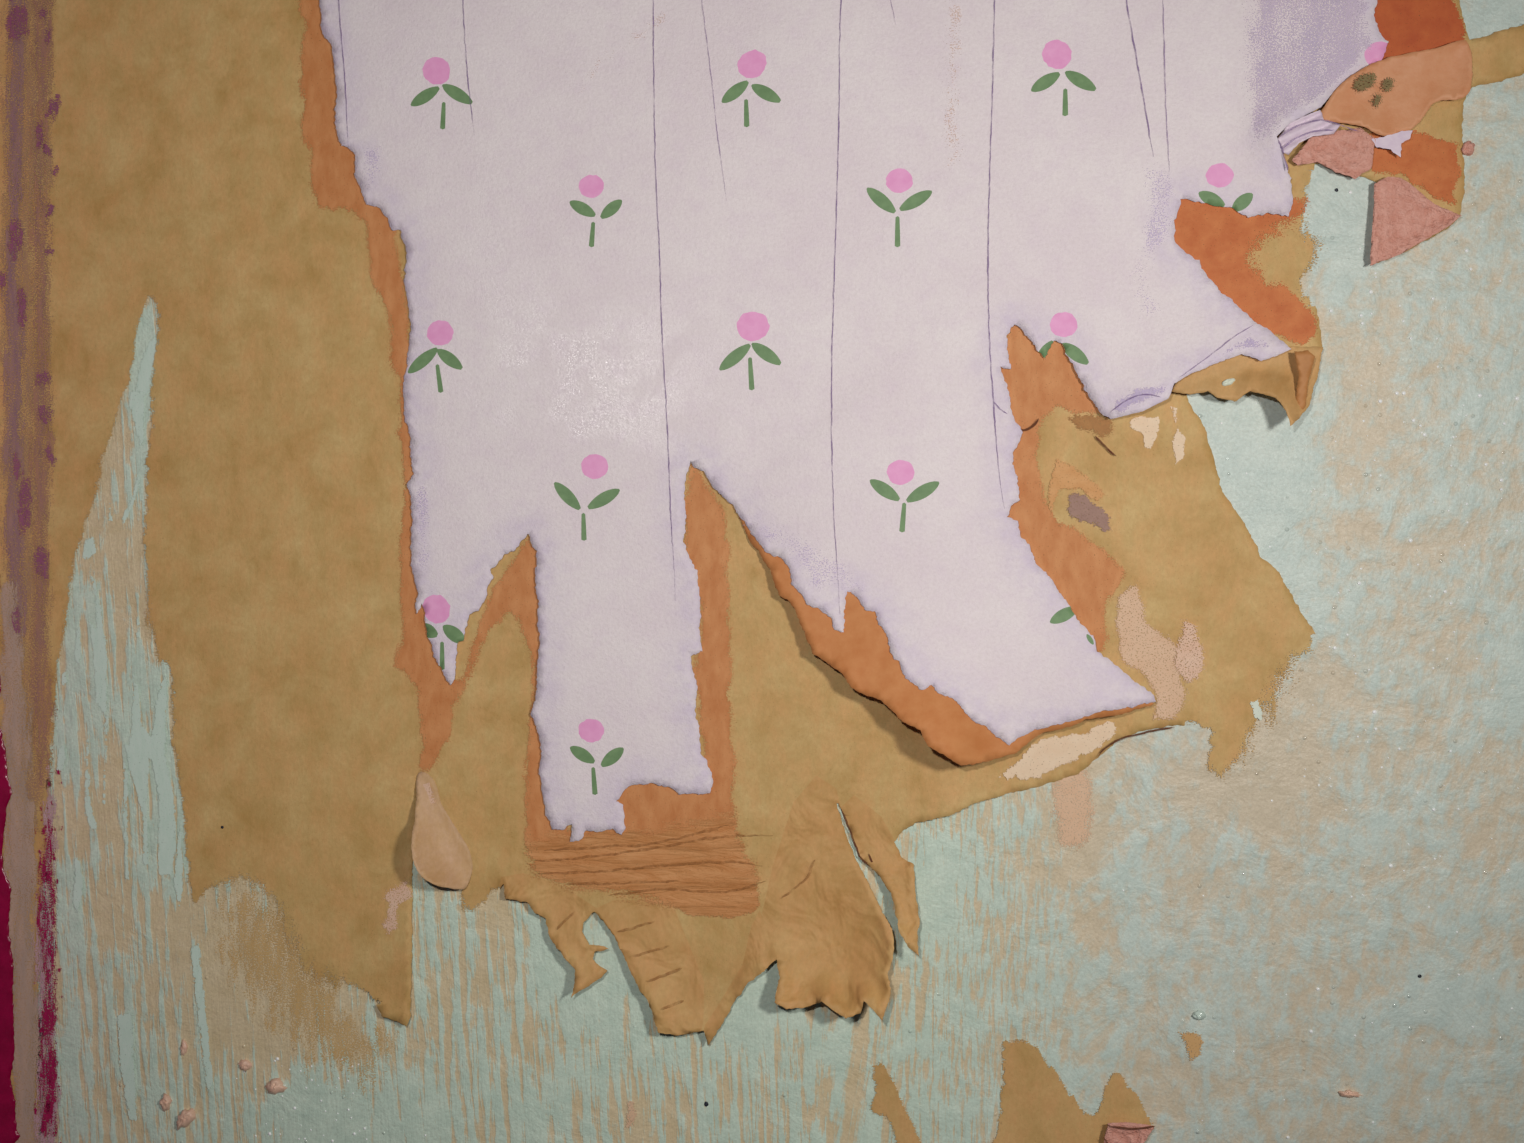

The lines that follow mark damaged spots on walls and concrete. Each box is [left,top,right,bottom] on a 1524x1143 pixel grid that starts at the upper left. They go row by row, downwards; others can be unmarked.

peeling [1130,346,1323,464]
flaking render [1250,700,1263,720]
flaking render [1000,721,1117,780]